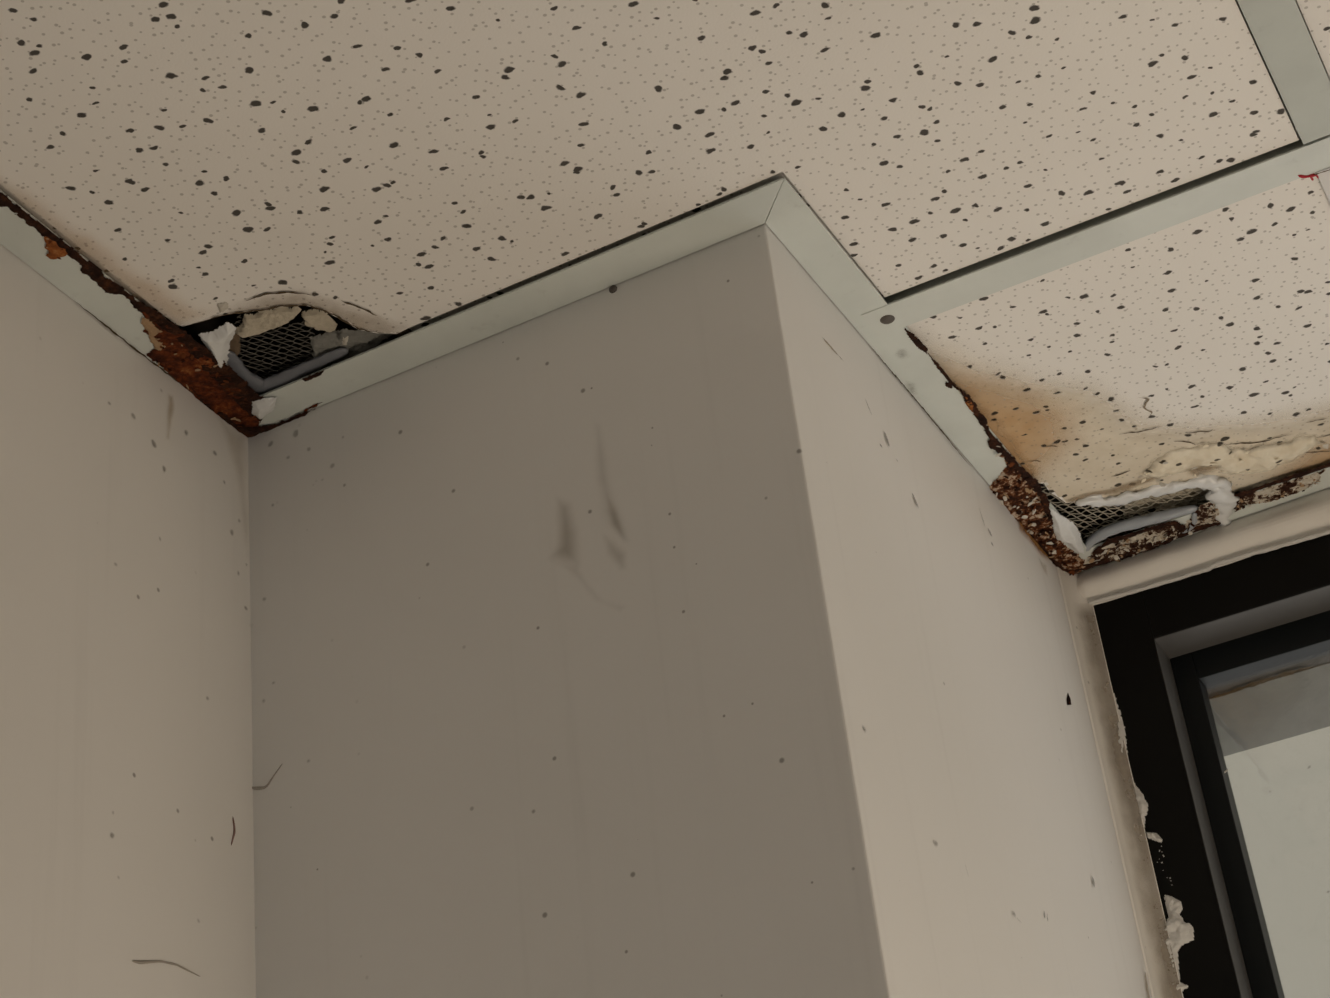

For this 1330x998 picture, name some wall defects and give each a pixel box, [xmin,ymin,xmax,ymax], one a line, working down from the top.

corrosion [0,192,322,438]
corrosion [904,328,1330,576]
water stain [939,365,1330,503]